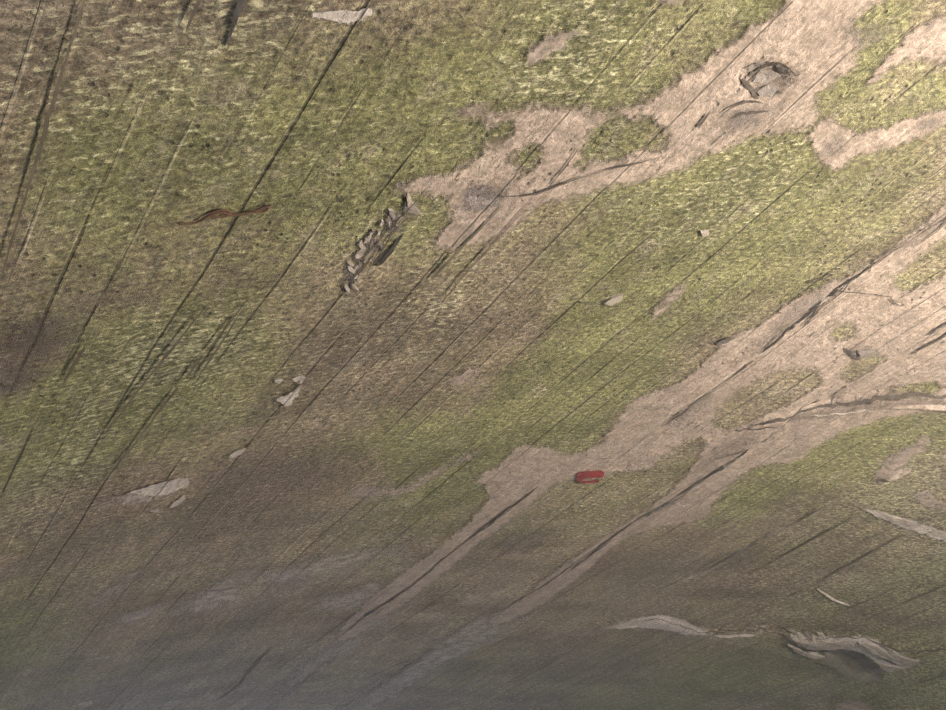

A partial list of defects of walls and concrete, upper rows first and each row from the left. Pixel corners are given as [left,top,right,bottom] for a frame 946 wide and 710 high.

peeling [292,8,374,24]
peeling [344,0,946,293]
leakage [108,477,190,512]
leakage [275,375,307,407]
peeling [336,205,946,641]
crack [489,368,946,620]
crack [601,218,946,459]
spalling [779,629,920,683]